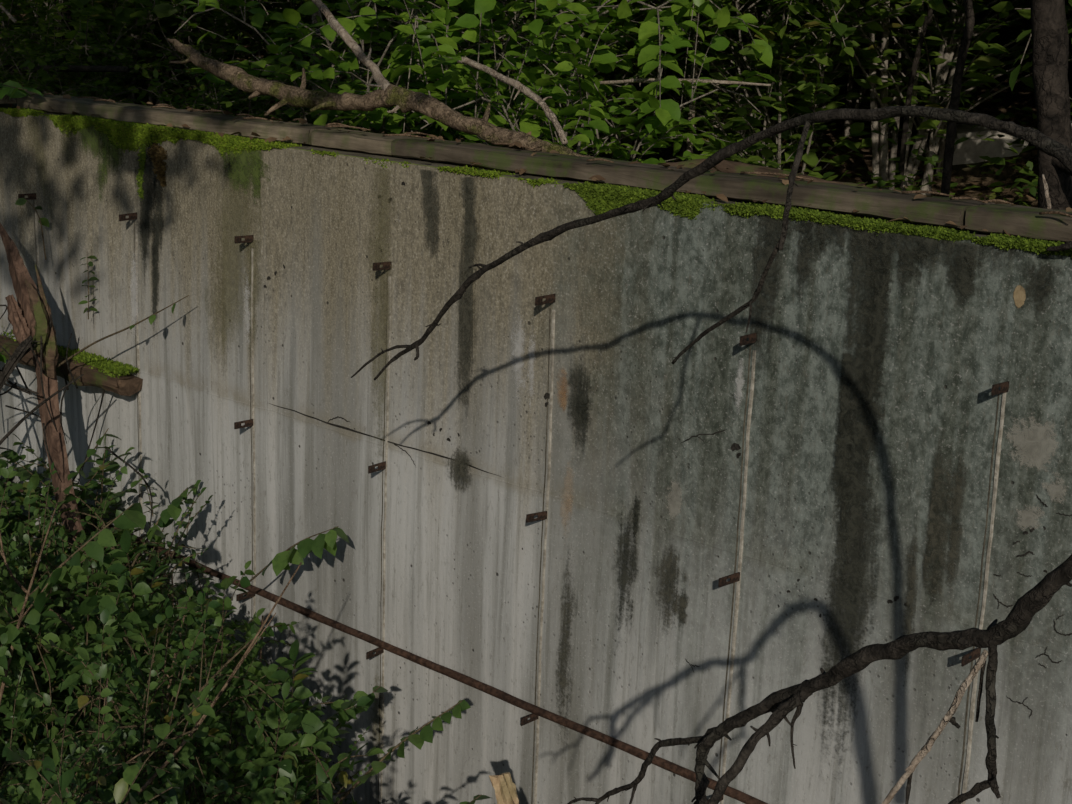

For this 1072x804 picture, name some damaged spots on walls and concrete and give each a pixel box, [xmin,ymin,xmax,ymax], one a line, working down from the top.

damp [568,364,590,445]
damp [749,215,1021,672]
damp [617,496,640,630]
damp [823,672,859,753]